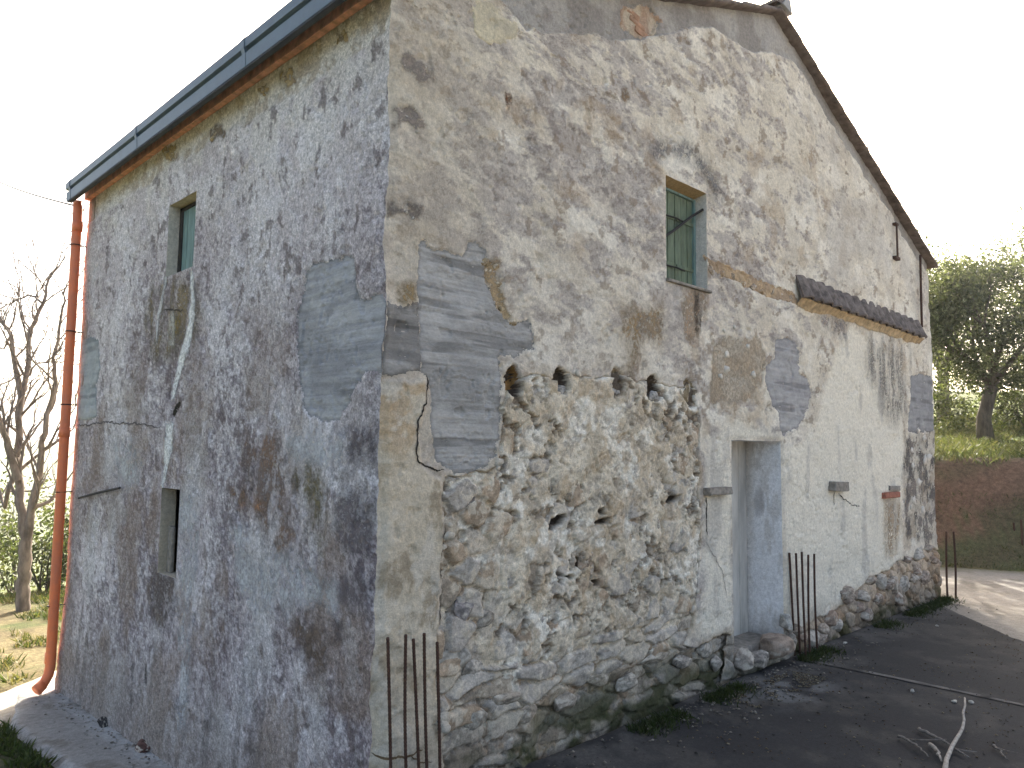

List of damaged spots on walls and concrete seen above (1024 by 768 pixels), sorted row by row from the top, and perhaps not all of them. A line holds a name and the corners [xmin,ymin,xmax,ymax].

flaking render [620,4,663,39]
spalling [481,258,517,326]
crack [77,402,181,428]
crack [416,375,444,472]
leakage [869,348,905,416]
spalling [386,369,957,768]